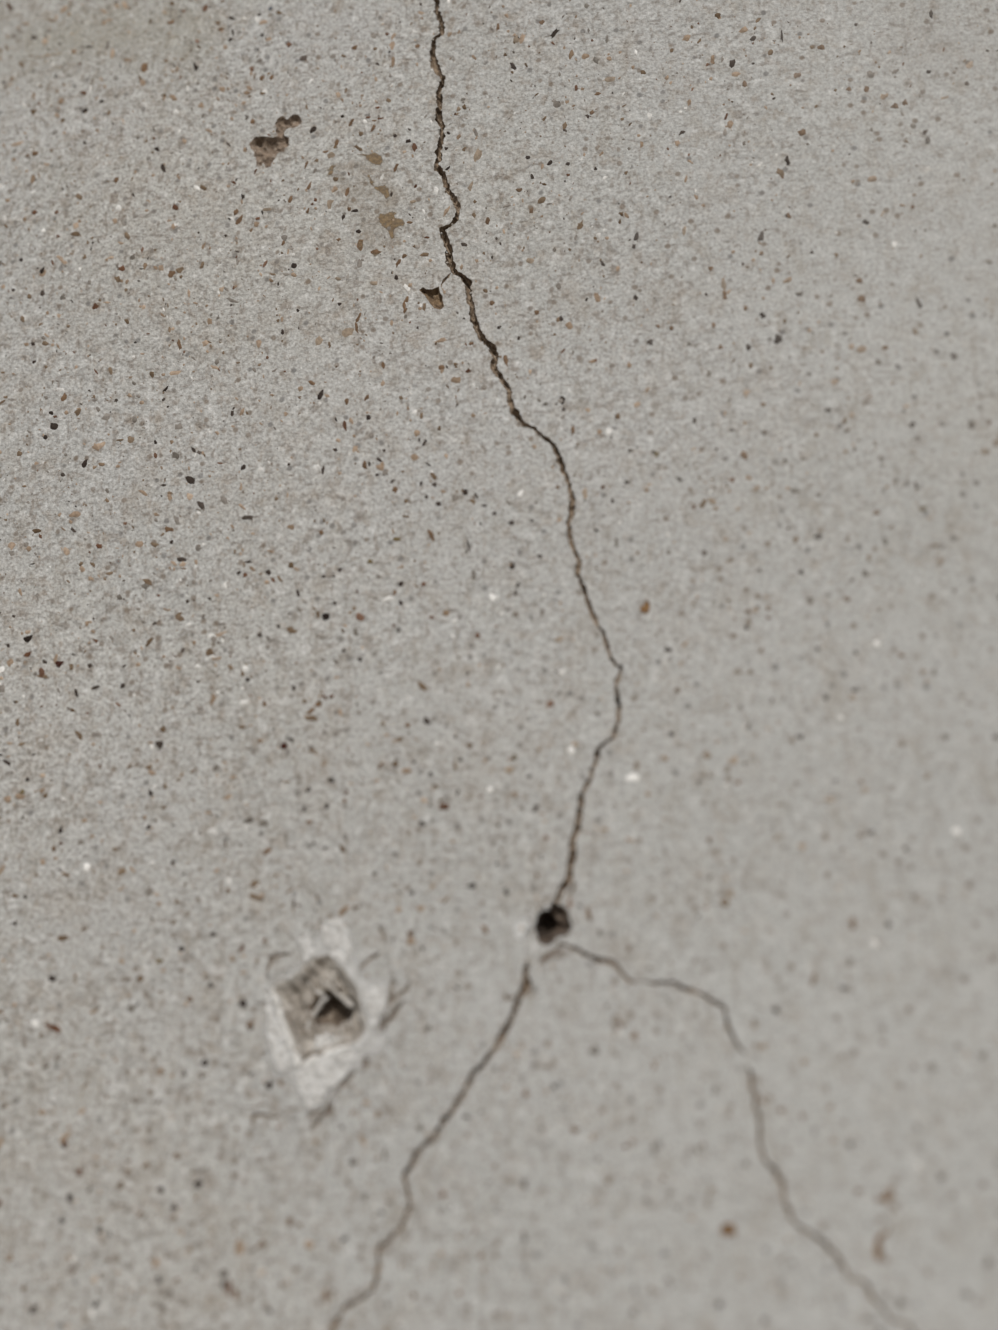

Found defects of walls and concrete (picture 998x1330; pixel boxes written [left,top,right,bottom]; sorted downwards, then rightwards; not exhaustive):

crack [429,0,624,903]
spalling [241,916,410,1131]
crack [330,960,532,1330]
crack [556,942,913,1330]